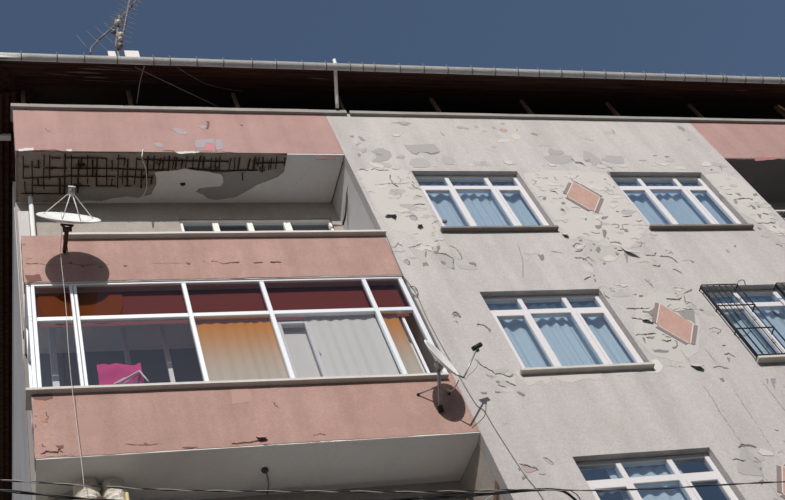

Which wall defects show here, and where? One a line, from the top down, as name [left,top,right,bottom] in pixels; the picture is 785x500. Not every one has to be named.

spalling [18,139,287,203]
peeling [350,135,461,269]
peeling [523,159,647,282]
peeling [705,169,784,236]
peeling [632,289,704,362]
peeling [737,443,765,485]